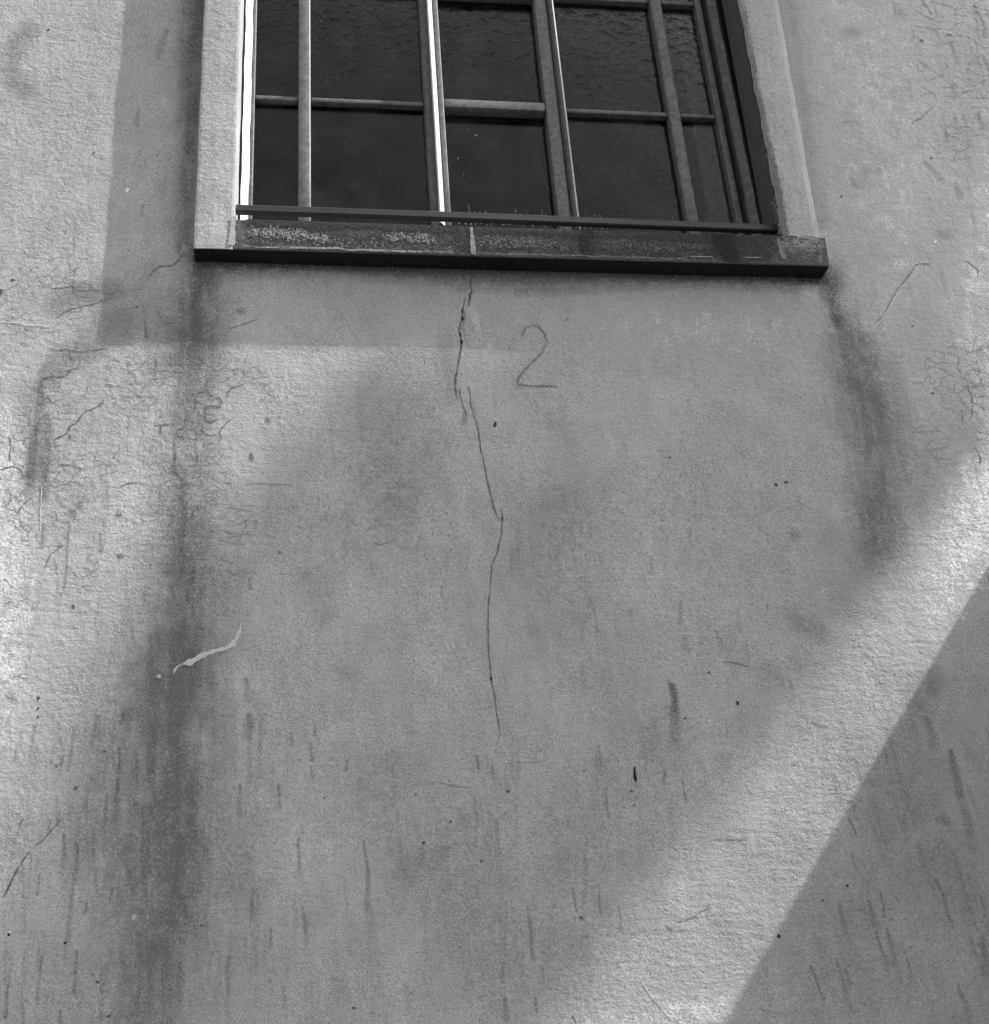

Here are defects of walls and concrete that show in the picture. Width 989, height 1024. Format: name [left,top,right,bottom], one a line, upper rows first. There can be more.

leakage [156,255,220,402]
leakage [836,310,889,460]
crack [454,270,503,745]
peeling [157,623,241,678]
leakage [135,466,211,1024]